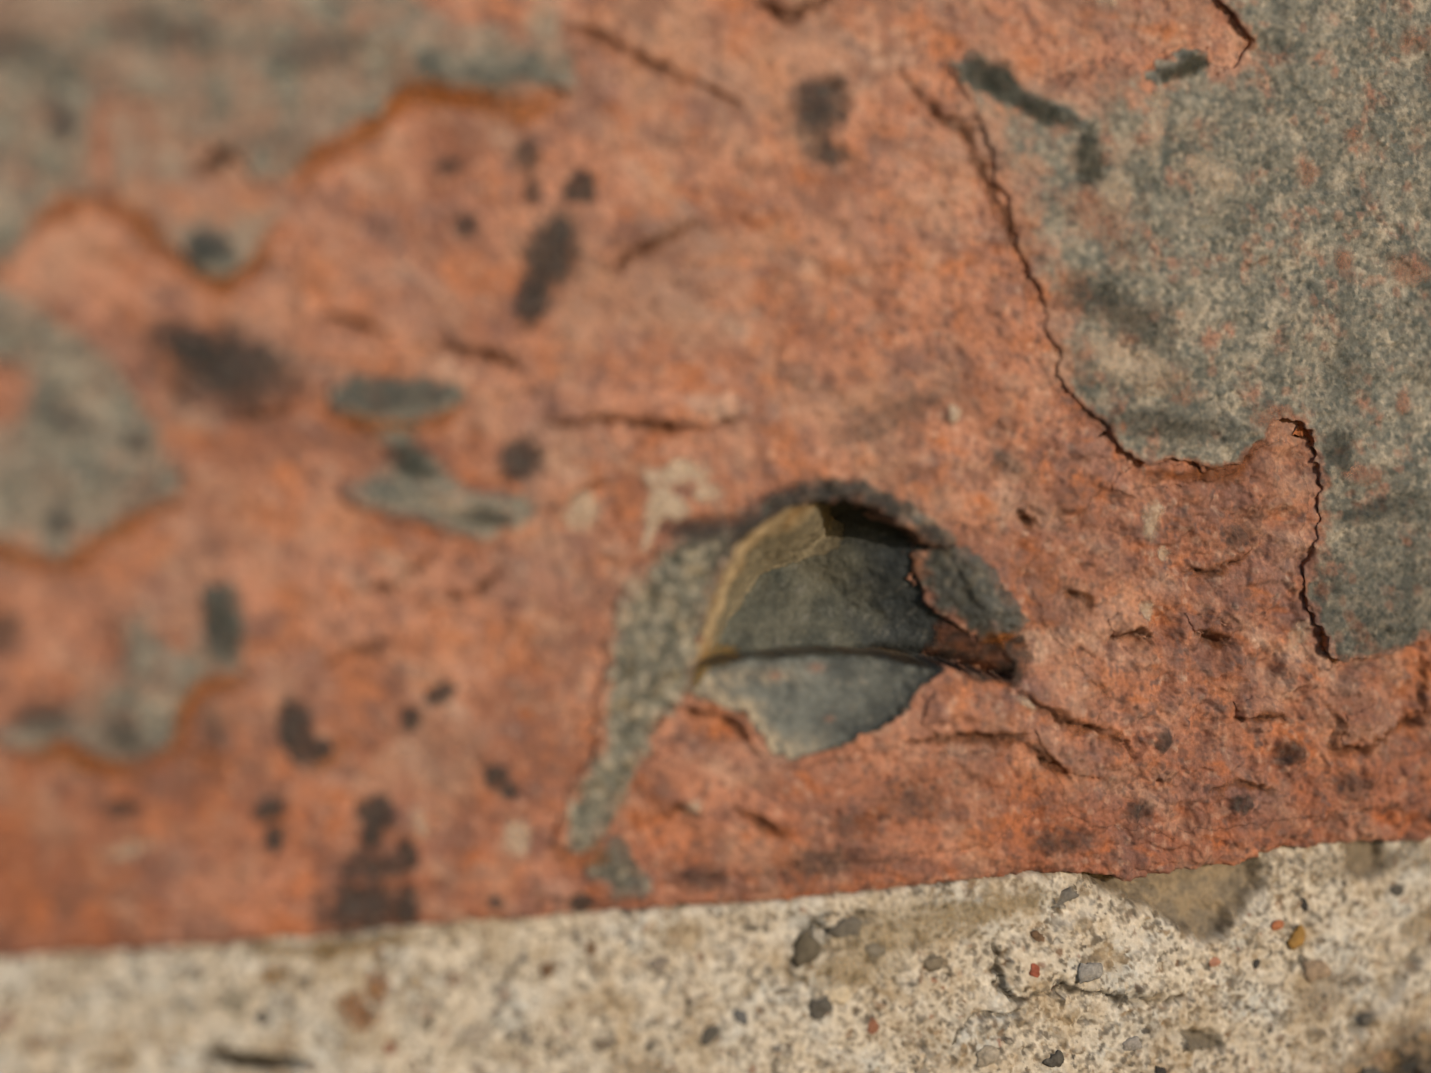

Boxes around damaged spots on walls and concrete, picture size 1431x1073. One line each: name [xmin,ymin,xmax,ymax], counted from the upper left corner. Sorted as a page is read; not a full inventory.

spalling [0,0,1114,902]
peeling [921,0,1431,839]